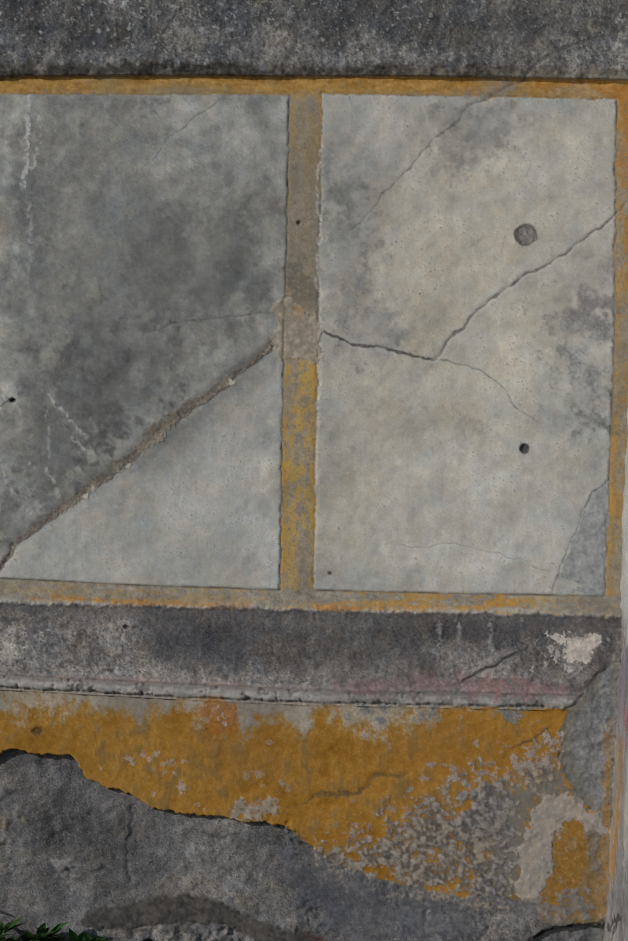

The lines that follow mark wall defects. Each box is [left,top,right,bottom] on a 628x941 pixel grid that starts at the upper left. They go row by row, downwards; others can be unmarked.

crack [324,331,431,360]
crack [0,336,276,570]
crack [461,648,526,682]
spalling [542,631,601,673]
spalling [0,730,605,941]